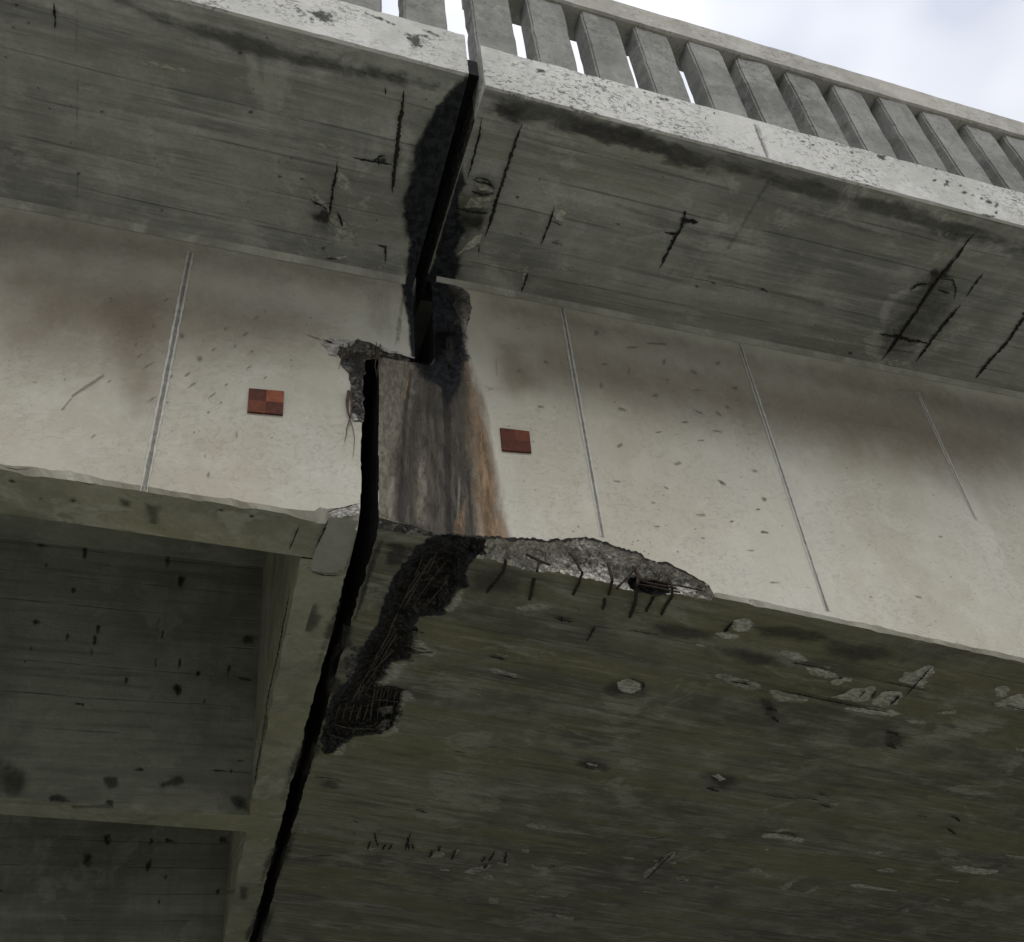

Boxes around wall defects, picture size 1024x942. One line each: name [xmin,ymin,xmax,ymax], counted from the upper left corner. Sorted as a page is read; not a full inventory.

crack [352,88,405,193]
spalling [309,281,472,422]
leakage [379,76,478,536]
crack [657,211,698,268]
crack [976,312,1024,378]
corrosion [463,363,508,538]
crack [289,521,328,550]
crack [254,571,336,785]
spalling [320,533,714,755]
spalling [714,651,935,724]